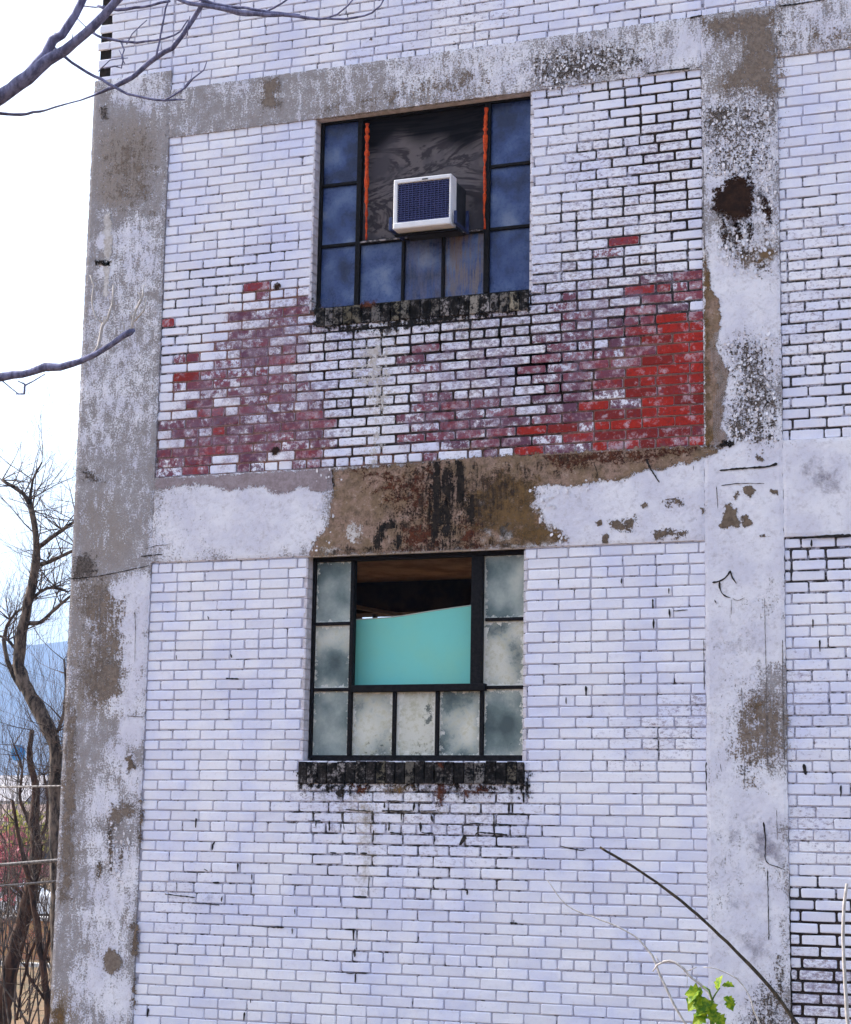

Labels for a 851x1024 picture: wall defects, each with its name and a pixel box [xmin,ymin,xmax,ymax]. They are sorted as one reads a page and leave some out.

crack [699,150,707,249]
peeling [153,1,791,557]
damp [322,454,601,554]
damp [69,549,101,584]
crack [705,570,807,791]